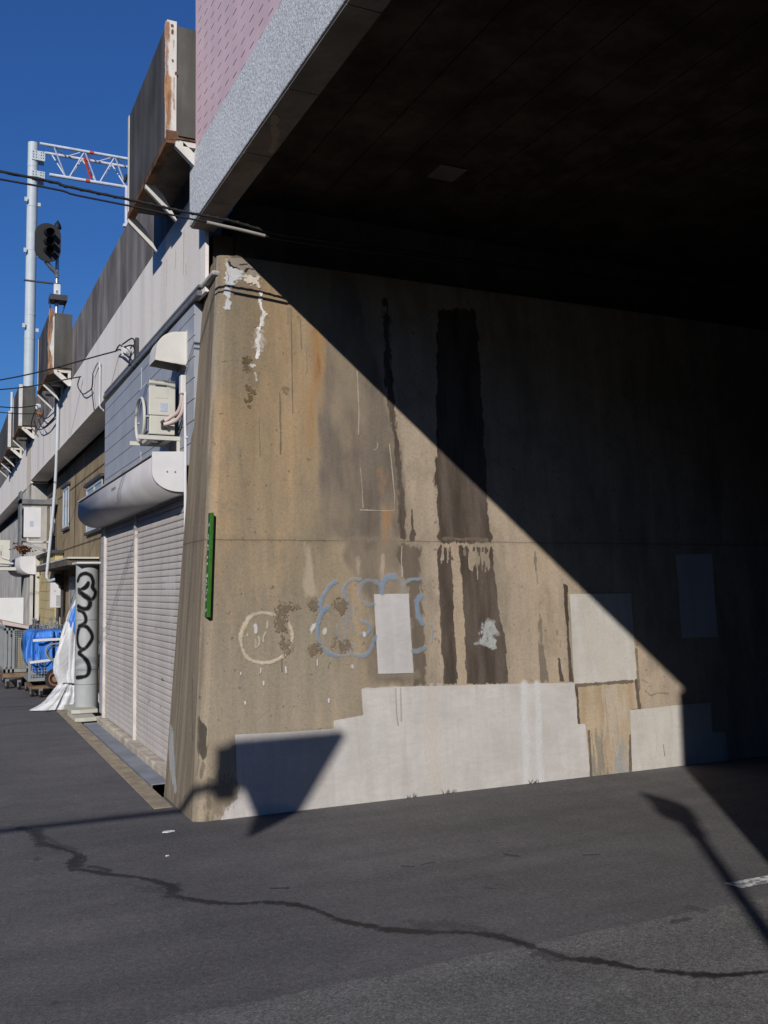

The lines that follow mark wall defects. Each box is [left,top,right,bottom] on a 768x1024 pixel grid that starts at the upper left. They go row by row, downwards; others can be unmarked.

corrosion [165,21,178,139]
damp [434,308,508,685]